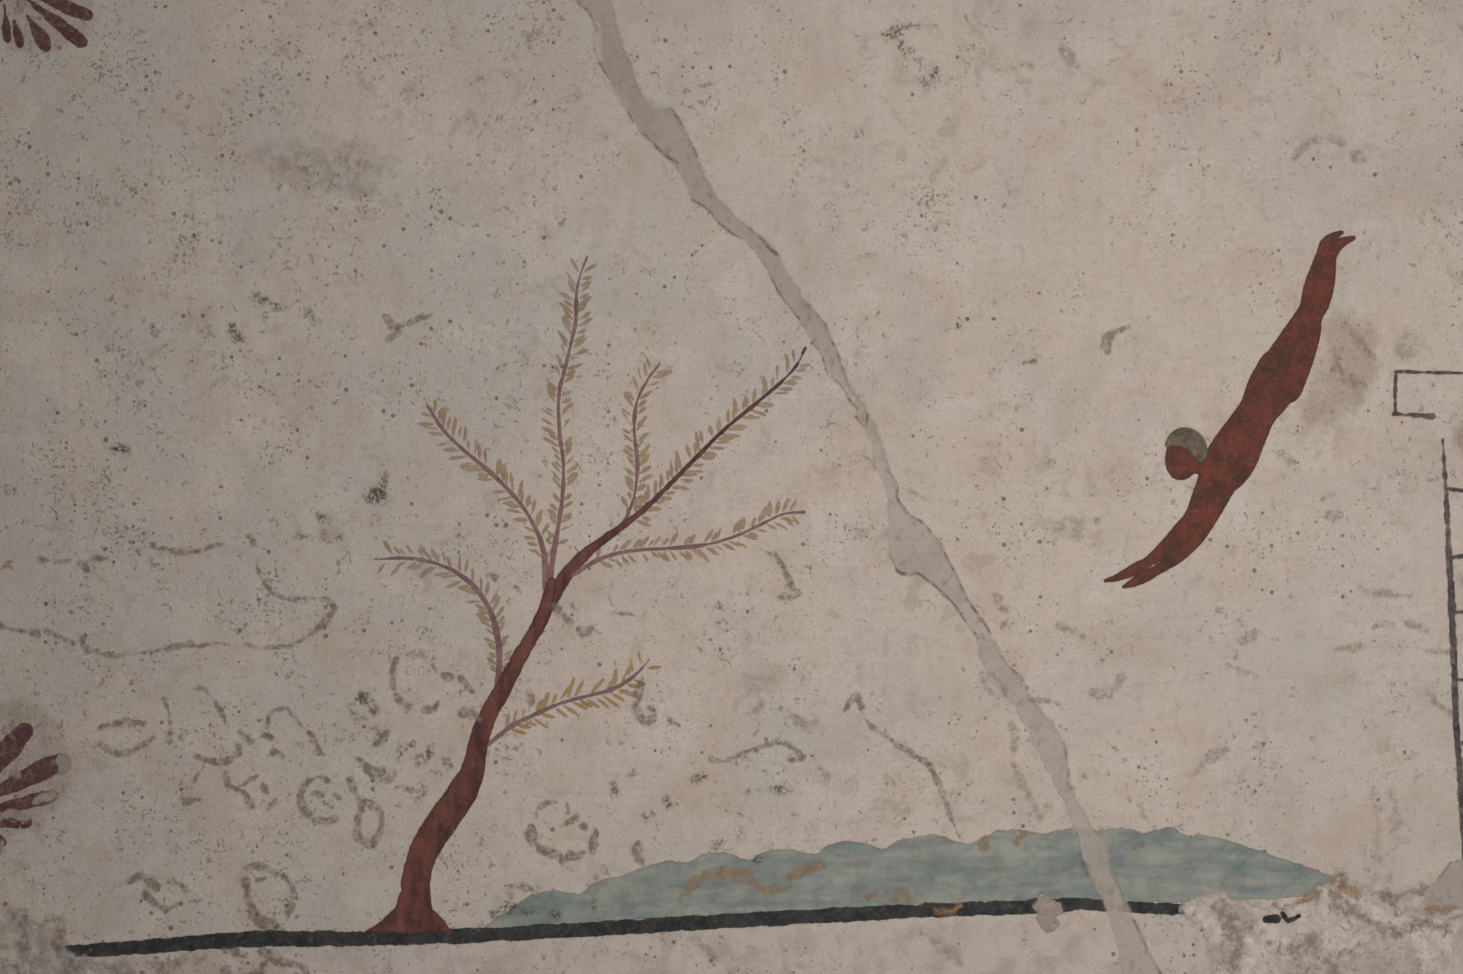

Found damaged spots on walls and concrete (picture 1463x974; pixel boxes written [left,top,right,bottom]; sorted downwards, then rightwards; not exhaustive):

crack [594,21,1162,974]
spalling [1179,873,1463,974]